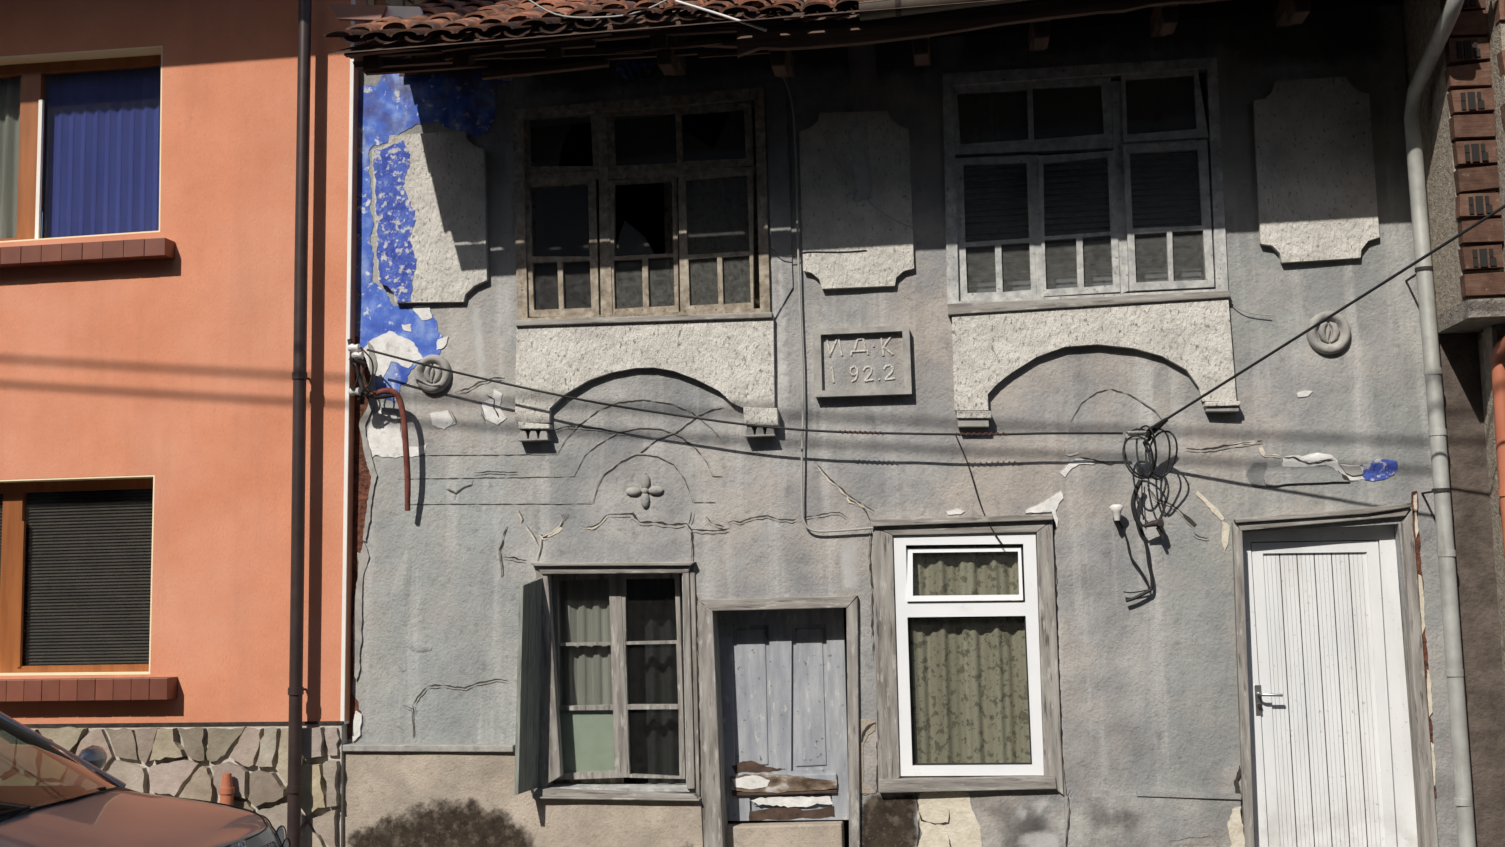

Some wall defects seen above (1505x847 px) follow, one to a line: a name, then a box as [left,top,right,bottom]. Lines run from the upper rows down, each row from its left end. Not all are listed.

peeling [347,68,516,742]
spalling [1246,452,1398,488]
water stain [349,799,532,847]
water stain [861,794,917,847]
peeling [1026,834,1058,847]
spalling [1227,766,1245,847]